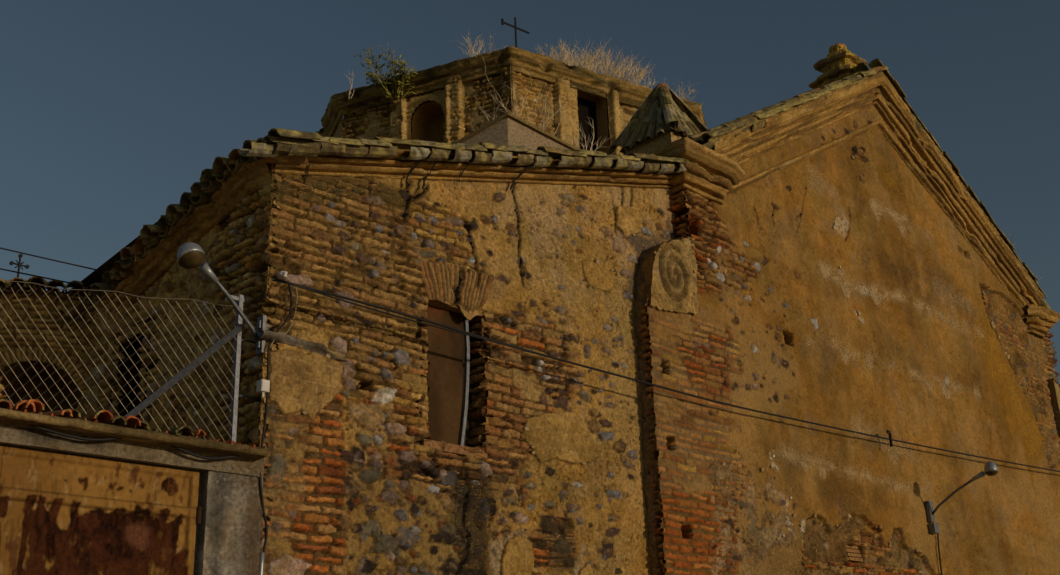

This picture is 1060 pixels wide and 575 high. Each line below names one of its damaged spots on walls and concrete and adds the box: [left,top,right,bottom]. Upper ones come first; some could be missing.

crack [401,160,436,221]
crack [510,154,535,275]
flaking render [979,284,1060,467]
rust [0,496,9,517]
rust [12,477,188,575]
crack [455,473,472,575]
flaking render [708,451,930,575]